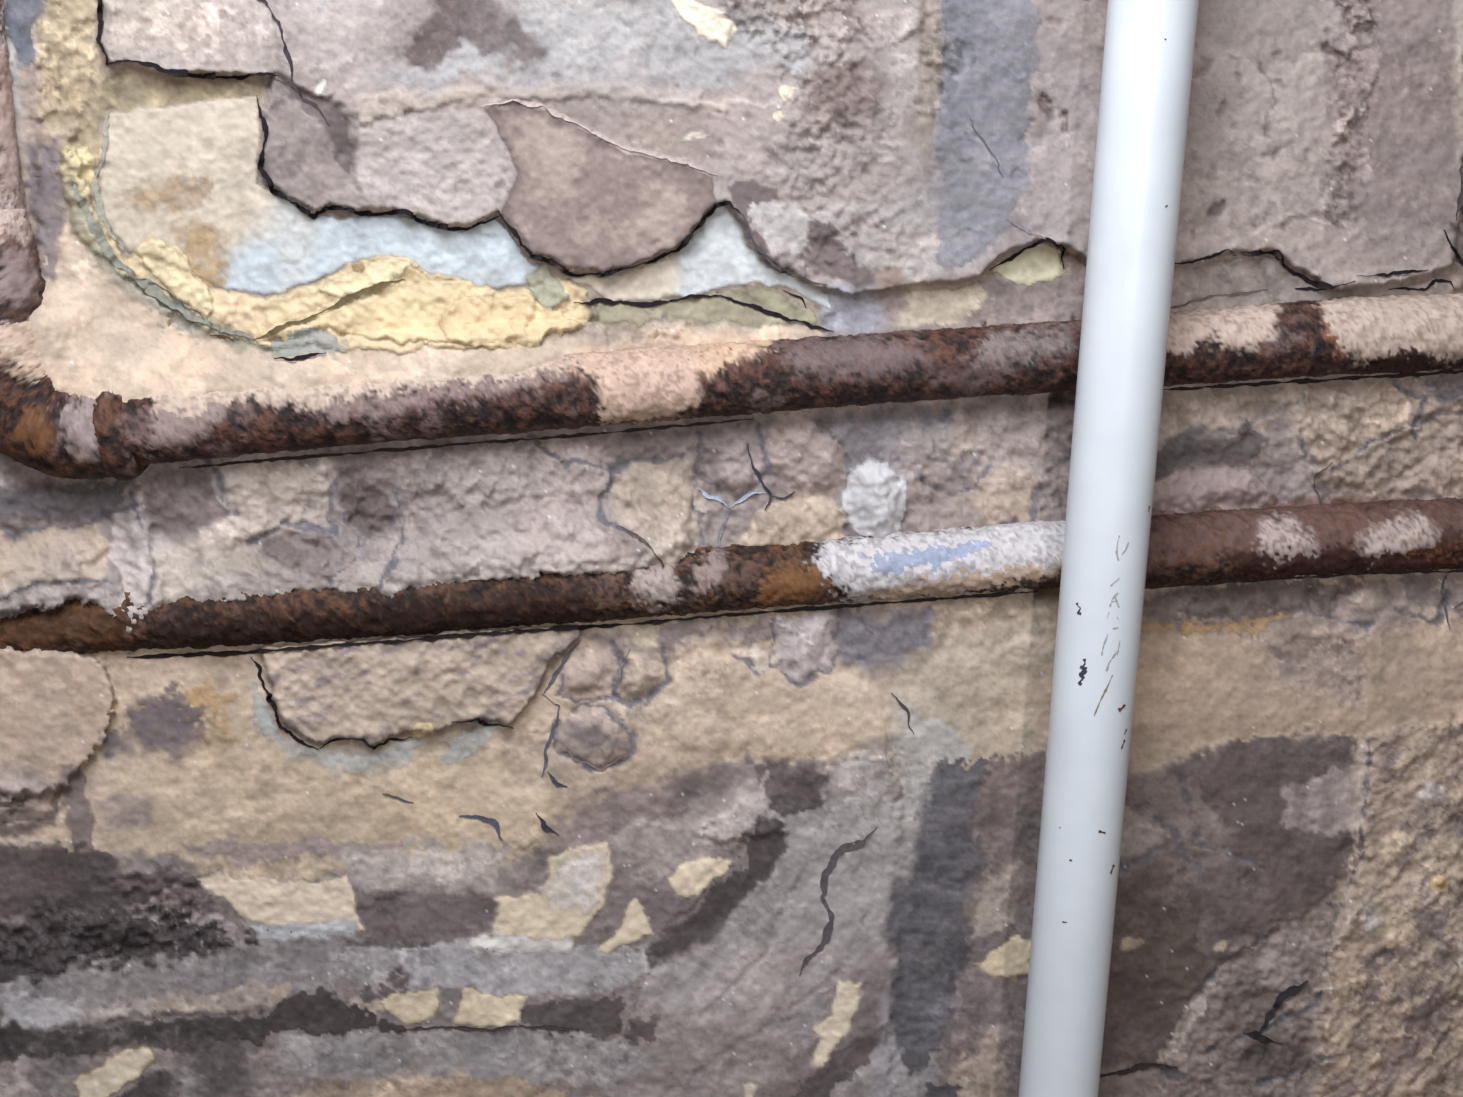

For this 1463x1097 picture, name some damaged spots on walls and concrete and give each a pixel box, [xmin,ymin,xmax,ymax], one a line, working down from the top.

leakage [387,0,812,90]
crack [96,0,834,332]
leakage [913,0,1037,266]
spalling [58,96,831,357]
peeling [992,241,1066,286]
corrosion [19,408,53,454]
corrosion [1148,495,1463,573]
corrosion [758,561,830,607]
corrosion [1141,575,1363,636]
crack [127,591,1038,835]
crack [459,815,503,841]
crack [799,827,877,976]